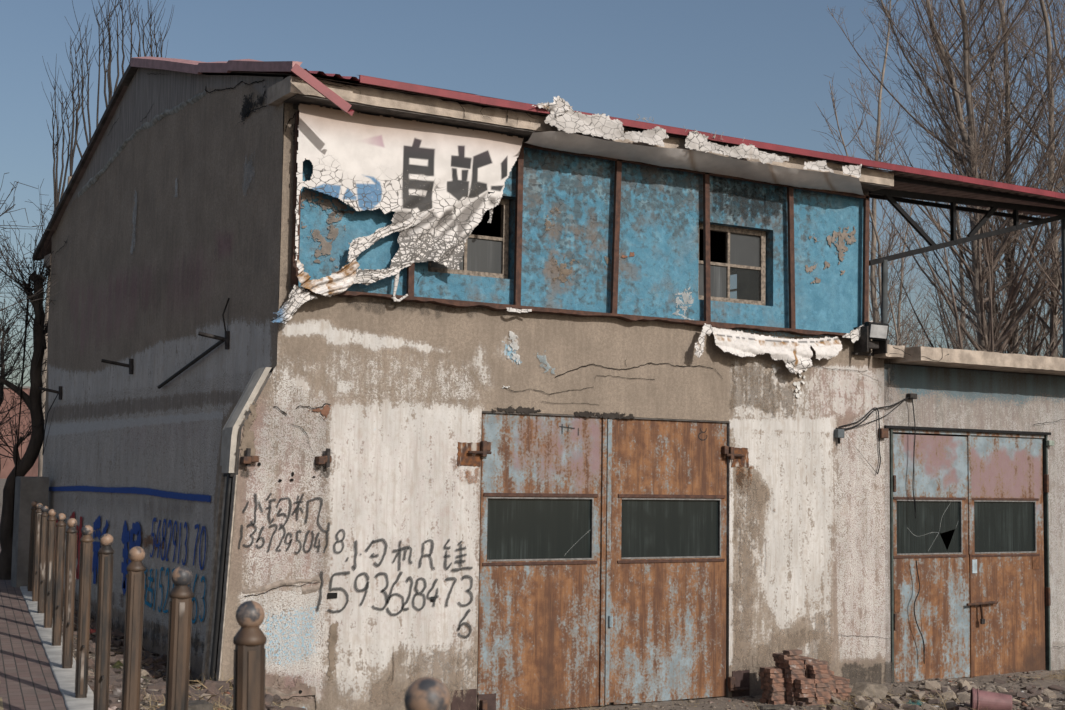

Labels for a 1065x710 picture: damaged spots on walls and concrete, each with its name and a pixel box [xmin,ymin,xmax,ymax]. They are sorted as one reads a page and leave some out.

crack [205,80,267,127]
peeling [301,189,355,268]
peeling [805,226,856,284]
crack [504,360,723,405]
damp [729,469,898,685]
damp [369,645,482,706]